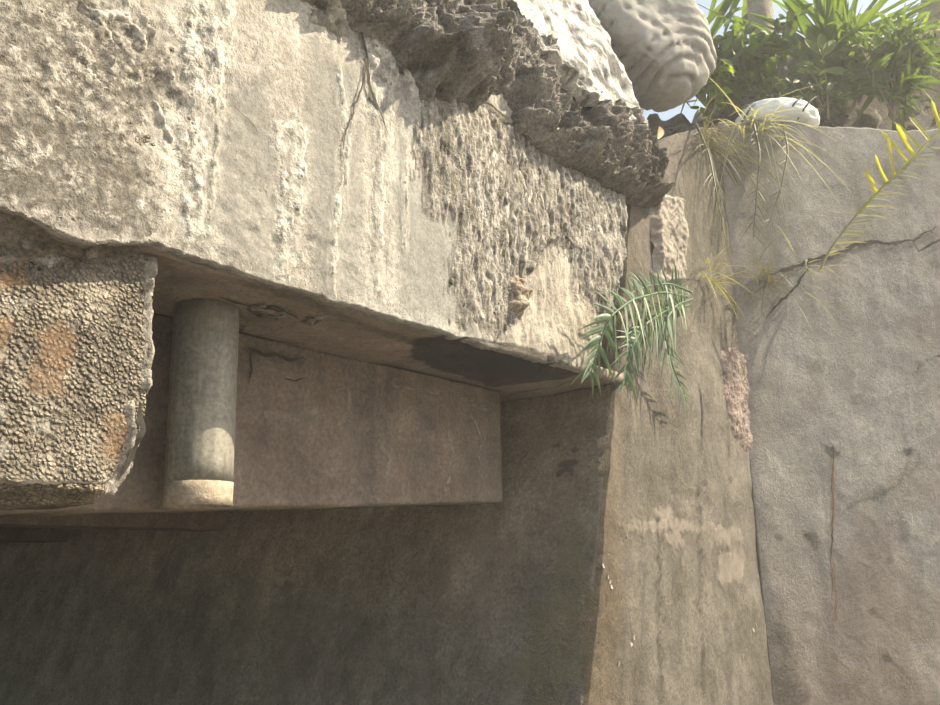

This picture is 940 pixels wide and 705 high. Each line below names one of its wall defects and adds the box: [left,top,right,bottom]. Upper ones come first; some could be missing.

crack [343,23,390,162]
peeling [409,96,628,351]
crack [763,227,940,318]